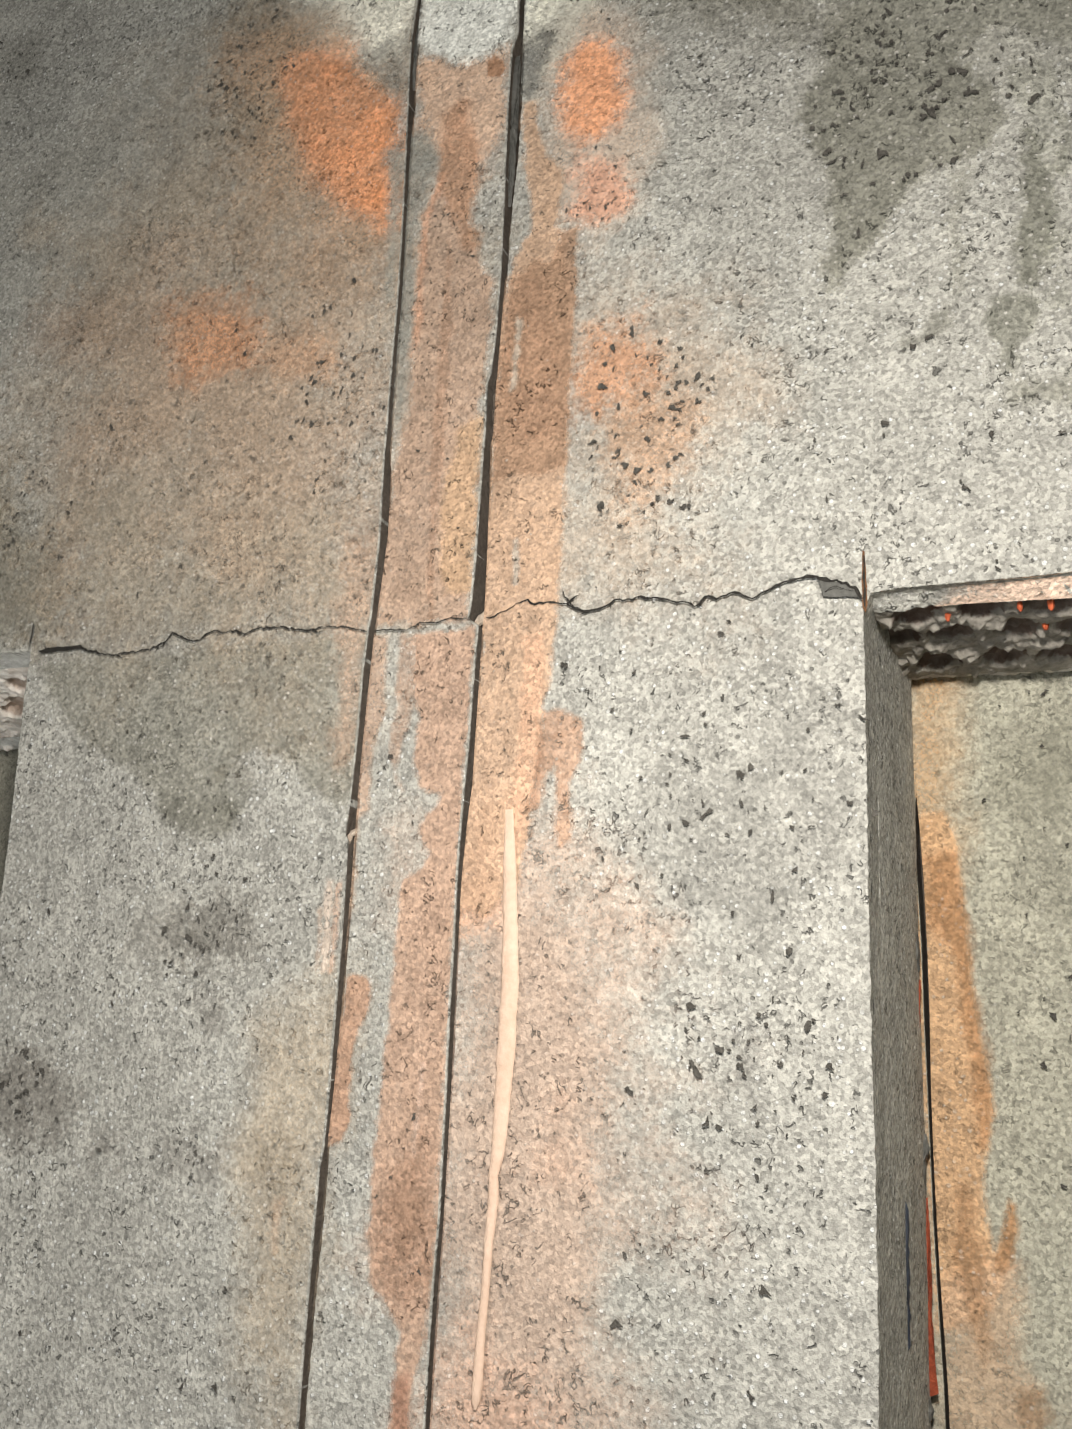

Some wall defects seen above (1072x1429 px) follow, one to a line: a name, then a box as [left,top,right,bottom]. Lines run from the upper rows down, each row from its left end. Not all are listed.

corrosion [284,49,397,221]
efflorescence [308,0,572,94]
leakage [801,0,1072,289]
leakage [988,128,1055,362]
crack [39,574,819,658]
corrosion [360,43,639,1429]
corrosion [329,975,369,1144]
corrosion [917,813,1015,1328]